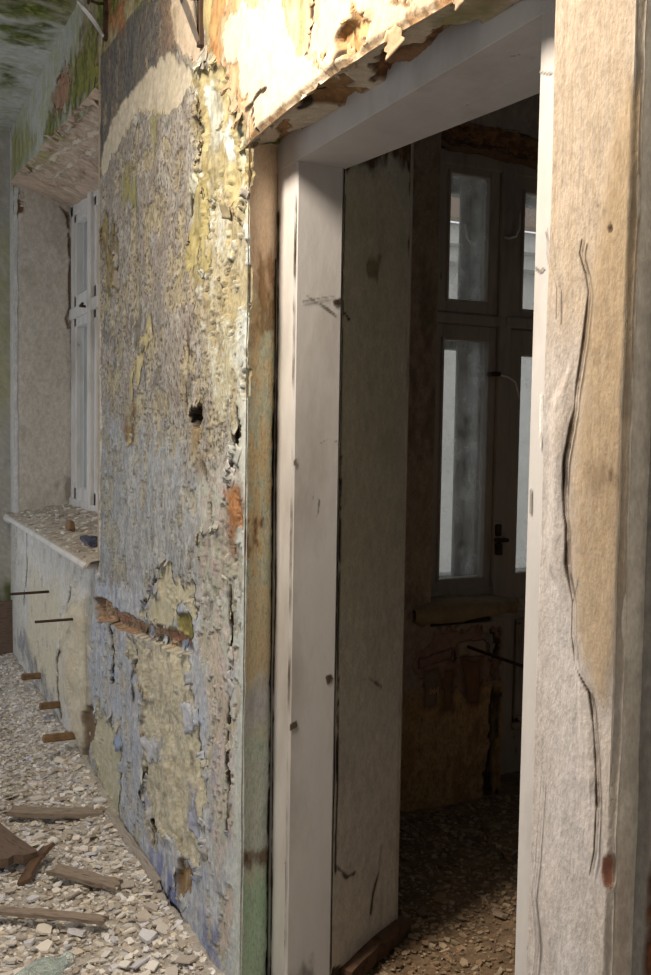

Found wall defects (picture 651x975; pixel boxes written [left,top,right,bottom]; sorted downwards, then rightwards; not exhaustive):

peeling [21,0,452,298]
flaking render [441,122,539,170]
flaking render [124,313,154,448]
flaking render [185,383,203,444]
crack [561,239,598,875]
flaking render [91,700,123,816]
flaking render [96,551,209,912]